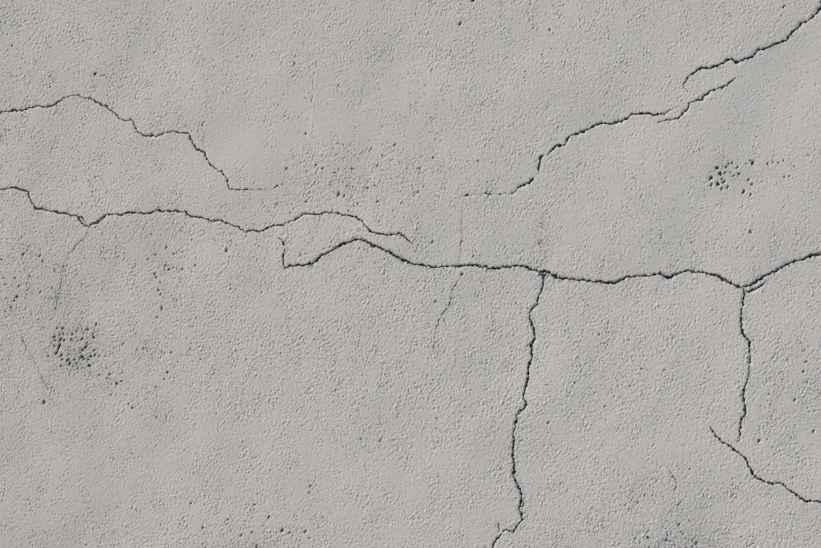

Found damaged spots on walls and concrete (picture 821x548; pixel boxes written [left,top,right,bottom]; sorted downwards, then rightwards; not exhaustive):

crack [683,2,821,87]
crack [0,94,285,191]
crack [464,78,736,196]
crack [0,187,821,548]